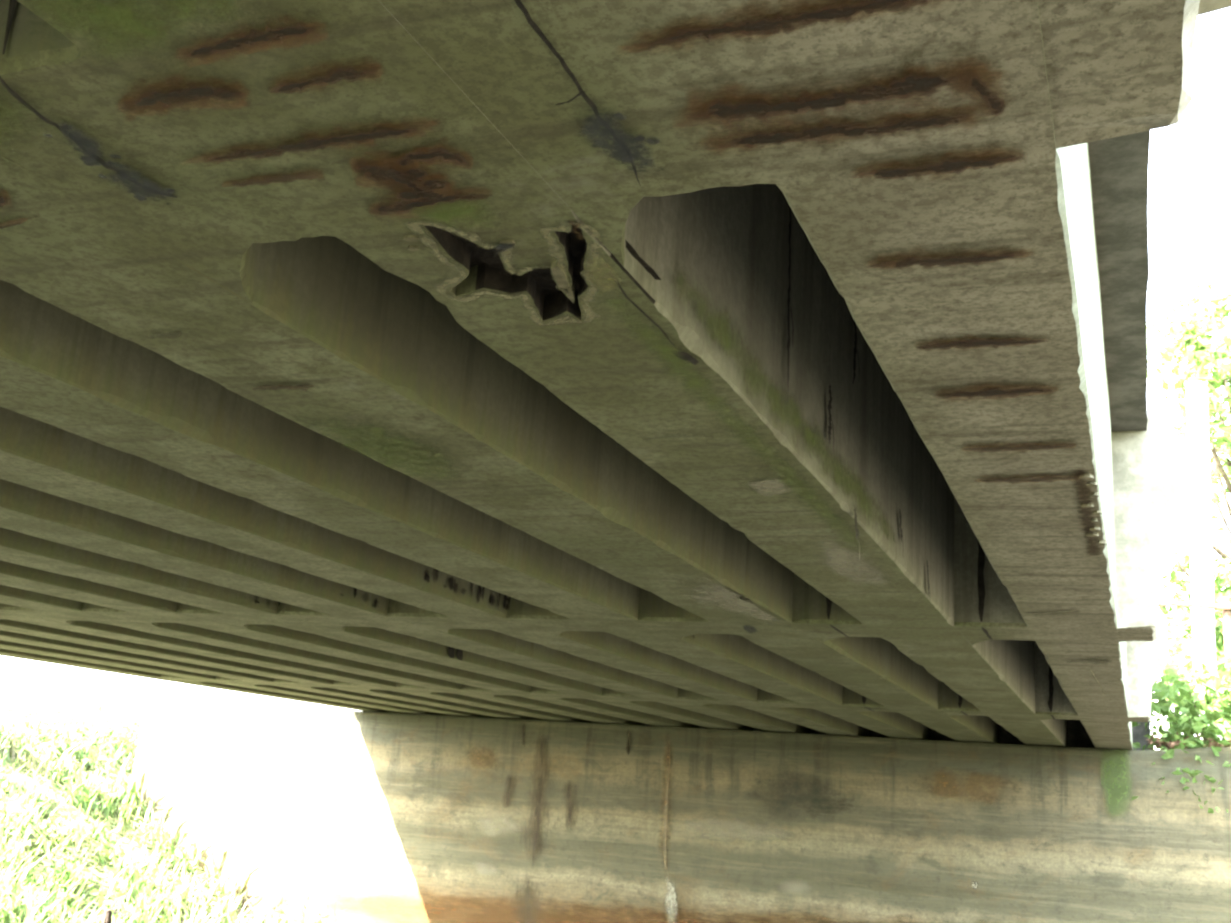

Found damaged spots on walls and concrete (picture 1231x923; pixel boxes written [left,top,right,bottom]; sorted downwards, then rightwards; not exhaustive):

rust [622,0,938,52]
crack [514,0,612,129]
crack [0,0,177,198]
rust [677,58,1006,153]
rust [185,120,491,218]
rust [853,148,1022,179]
spalling [403,220,603,326]
spalling [625,240,661,280]
rust [871,248,1027,269]
rust [917,337,1045,351]
rust [332,890,868,923]
damp [665,882,678,923]